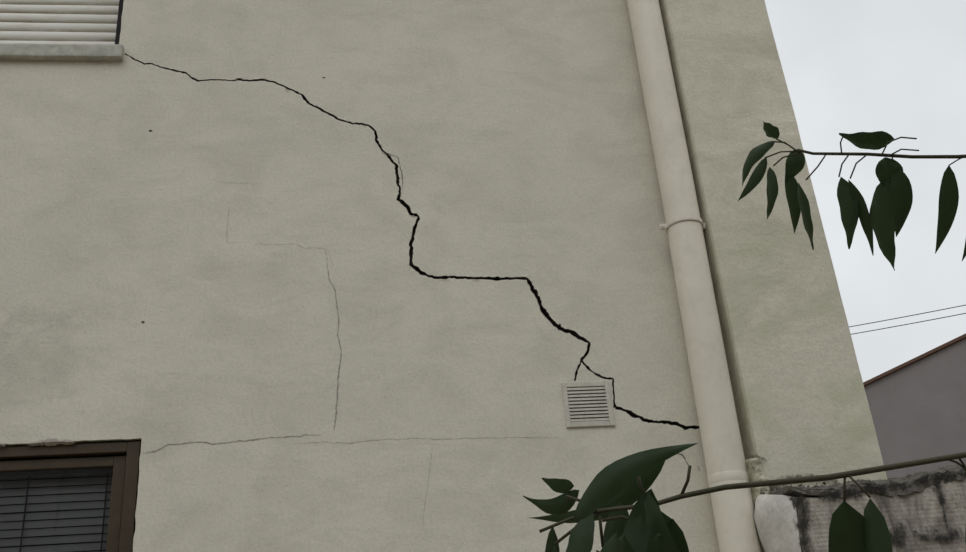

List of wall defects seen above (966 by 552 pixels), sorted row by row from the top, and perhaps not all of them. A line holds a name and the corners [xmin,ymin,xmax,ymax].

crack [125,53,699,430]